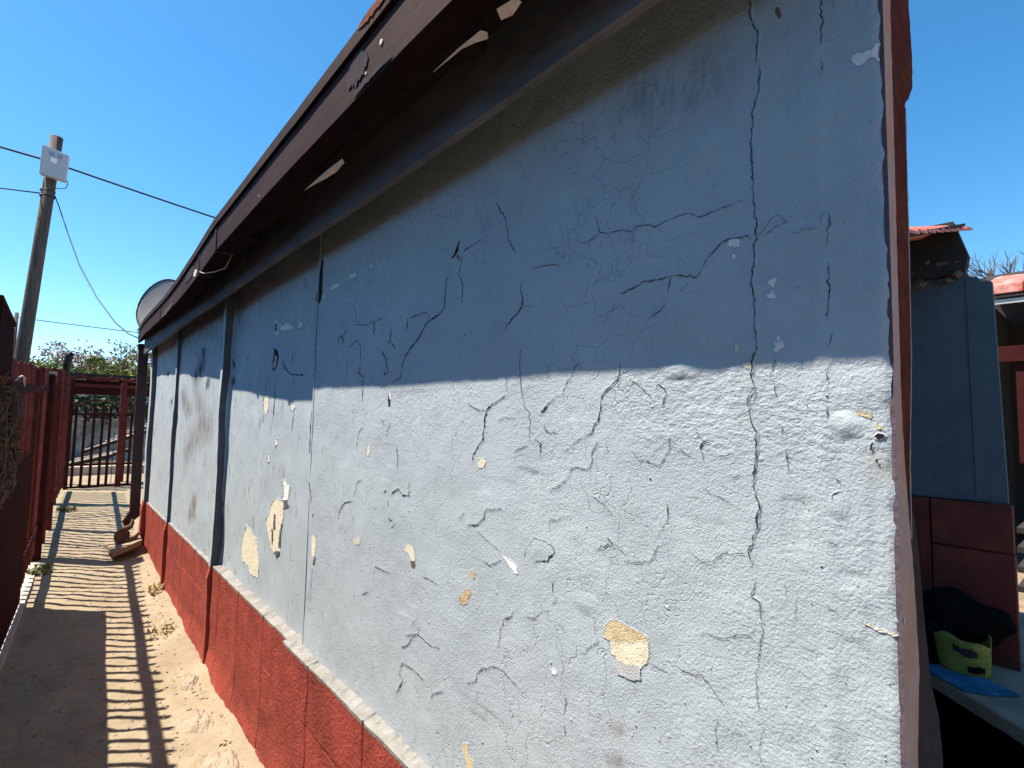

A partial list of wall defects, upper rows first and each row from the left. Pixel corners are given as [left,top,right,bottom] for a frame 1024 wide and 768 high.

crack [496,203,558,328]
crack [263,240,480,452]
crack [468,349,666,491]
crack [583,0,832,761]
peeling [241,479,290,578]
peeling [403,543,415,568]
crack [397,620,442,697]
peeling [459,568,476,605]
crack [457,507,570,693]
spalling [603,619,650,681]
peeling [864,617,905,638]